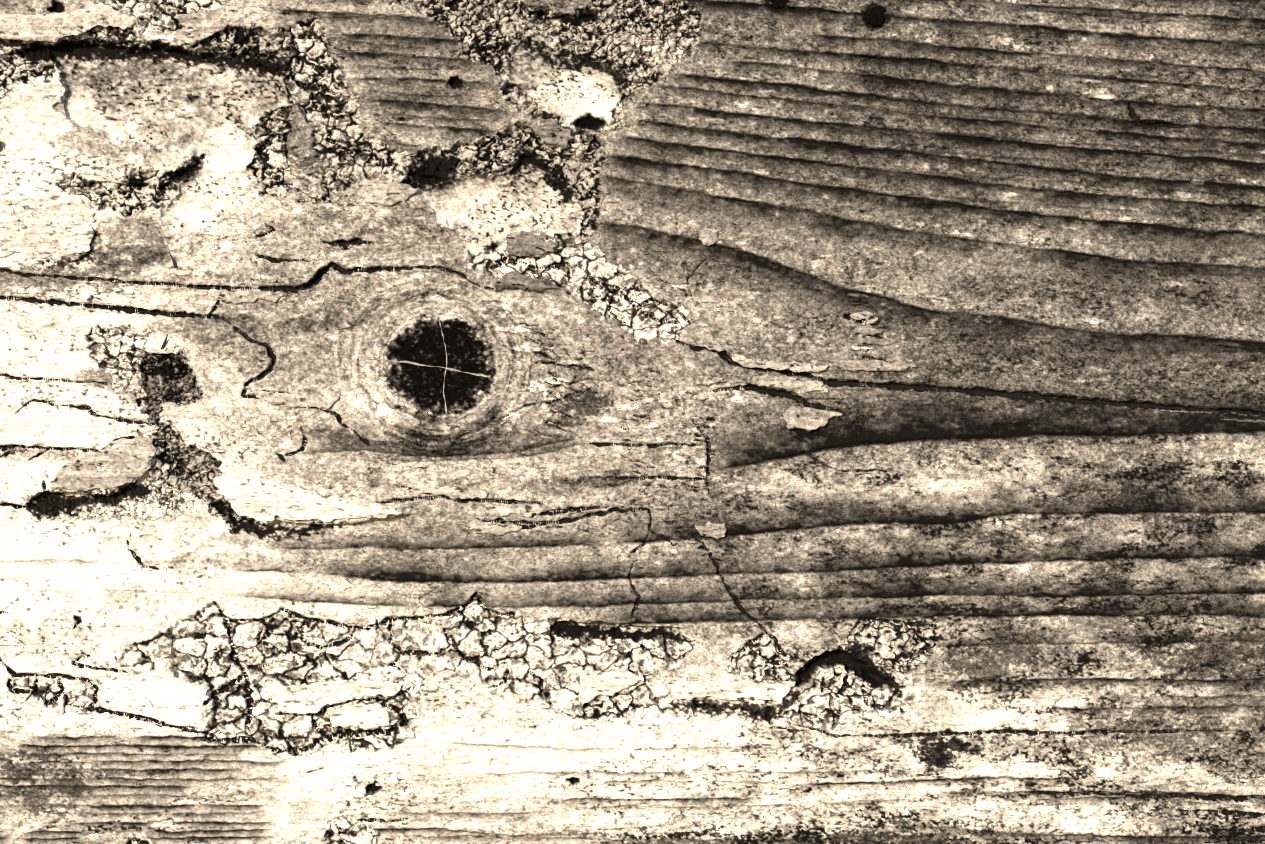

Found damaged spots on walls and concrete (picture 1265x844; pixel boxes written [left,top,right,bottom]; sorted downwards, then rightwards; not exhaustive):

spalling [0,0,703,343]
spalling [18,324,402,527]
crack [0,225,497,463]
crack [376,300,1265,657]
spalling [114,592,940,757]
crack [127,836,149,844]